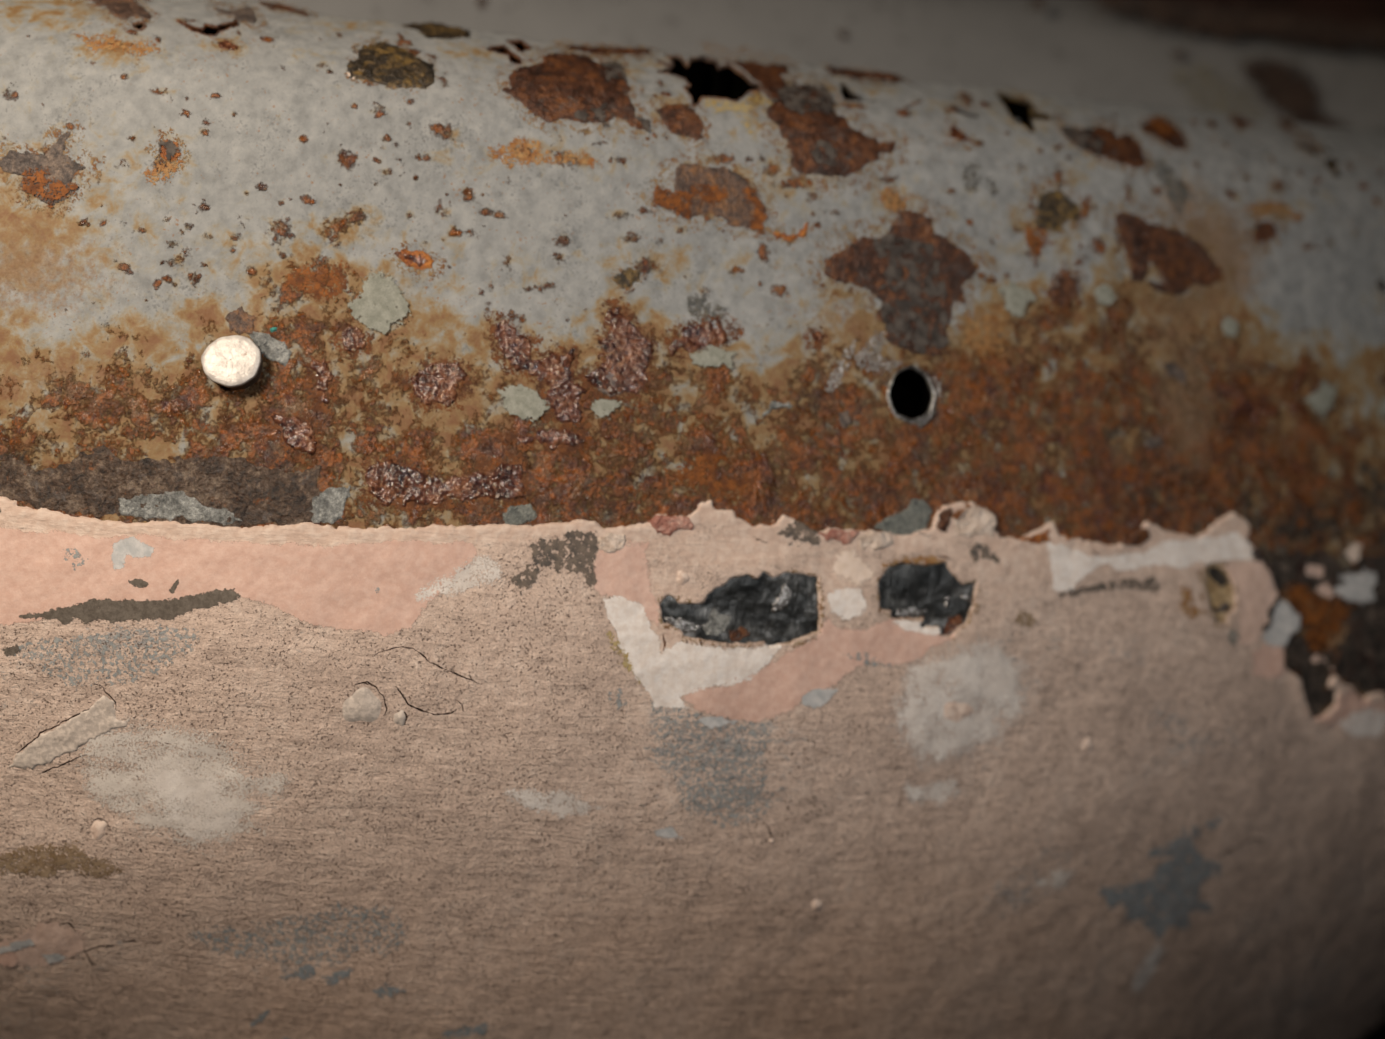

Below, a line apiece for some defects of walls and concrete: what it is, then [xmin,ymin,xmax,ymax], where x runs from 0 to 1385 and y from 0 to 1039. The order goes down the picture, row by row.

corrosion [487,39,1000,383]
corrosion [1017,112,1240,320]
corrosion [381,238,449,283]
corrosion [0,260,374,527]
corrosion [355,263,746,516]
peeling [118,491,242,526]
peeling [310,485,351,524]
peeling [502,503,537,525]
peeling [874,498,933,535]
corrosion [936,502,999,532]
spalling [657,569,825,651]
spalling [876,555,981,641]